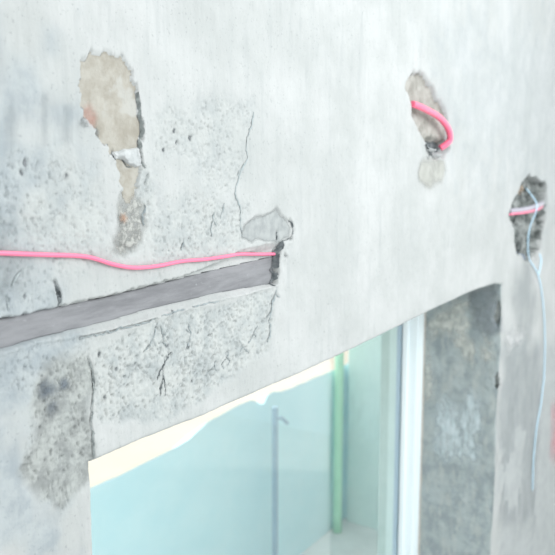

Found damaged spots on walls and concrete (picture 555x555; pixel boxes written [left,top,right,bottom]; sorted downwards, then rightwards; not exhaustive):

flaking render [78,51,146,254]
crack [211,112,254,236]
flaking render [242,209,290,243]
flaking render [405,73,445,160]
flaking render [509,175,547,261]
crack [79,301,219,396]
crack [87,360,95,458]